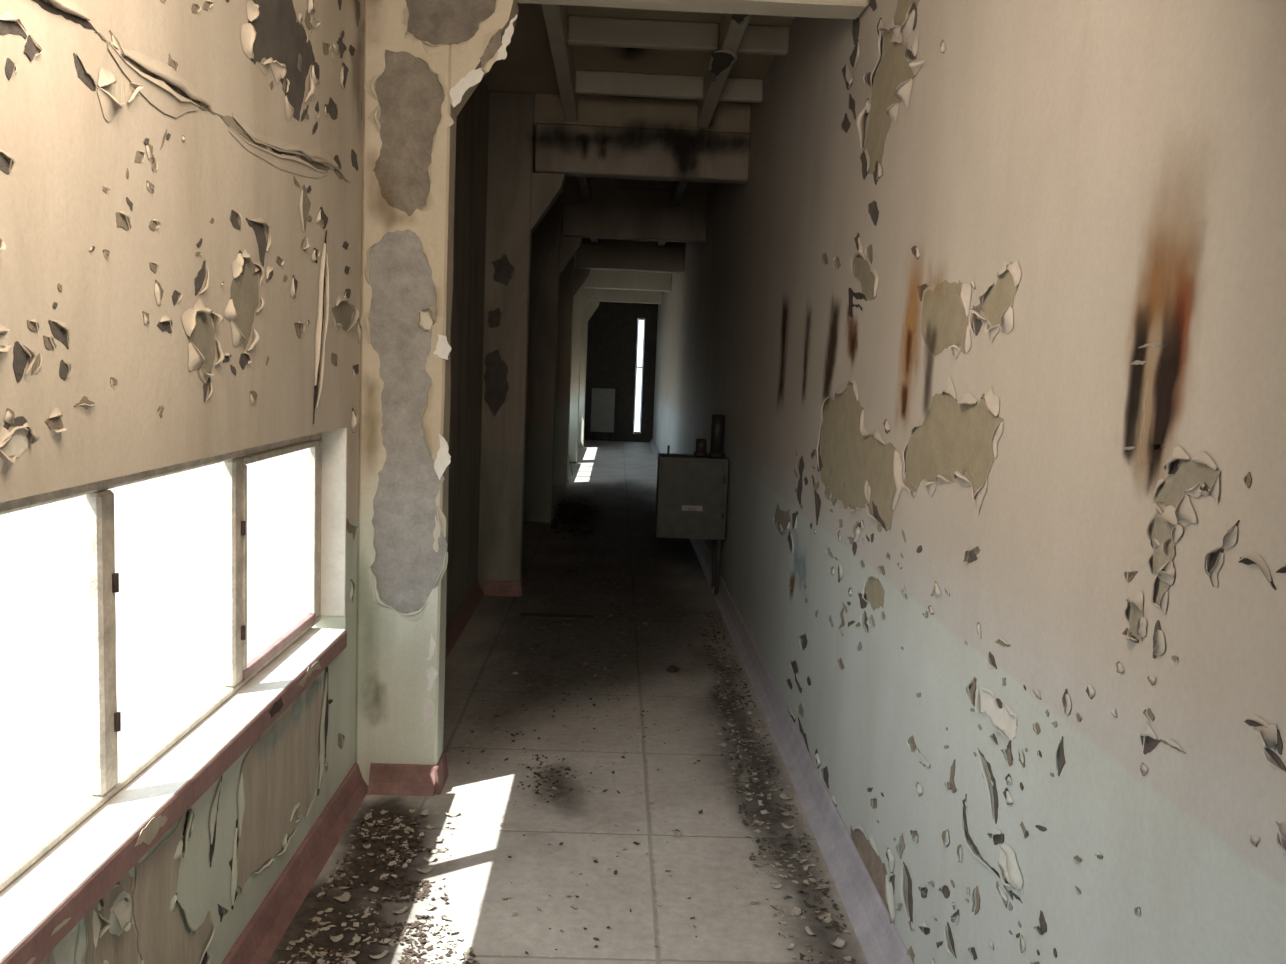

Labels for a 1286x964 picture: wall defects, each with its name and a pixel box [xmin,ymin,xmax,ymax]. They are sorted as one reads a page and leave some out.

peeling [0,11,44,80]
peeling [241,0,360,135]
peeling [0,283,72,382]
crack [32,0,351,424]
peeling [142,210,298,402]
flaking render [331,0,517,723]
peeling [918,257,1021,359]
corrosion [1123,245,1191,483]
peeling [773,375,1003,651]
peeling [27,809,215,964]
peeling [851,787,994,964]
peeling [942,622,1082,964]